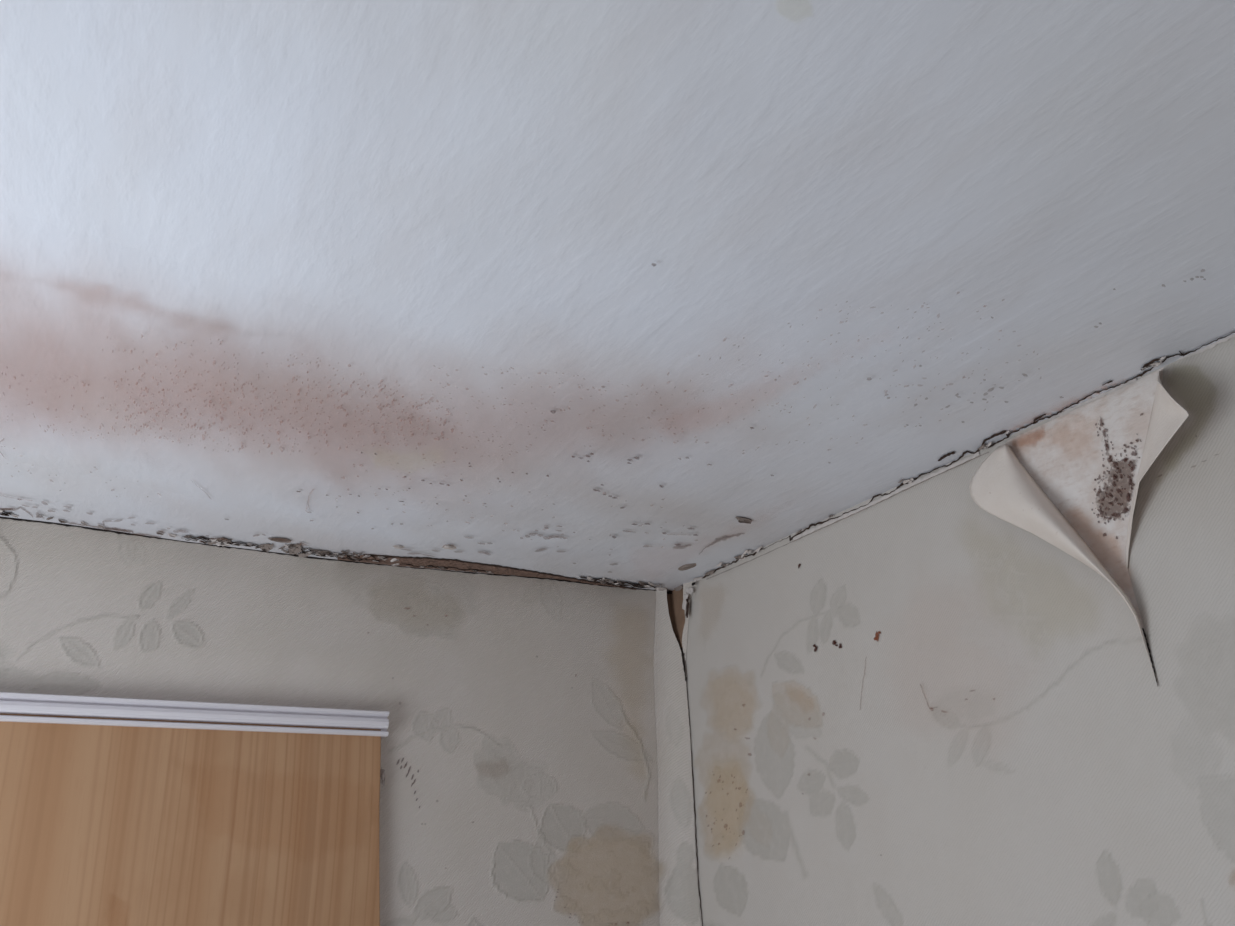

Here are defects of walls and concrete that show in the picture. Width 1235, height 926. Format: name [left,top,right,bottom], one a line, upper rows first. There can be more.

crack [0,516,656,591]
crack [703,332,1235,578]
flaking render [793,334,1235,644]
crack [686,677,703,926]